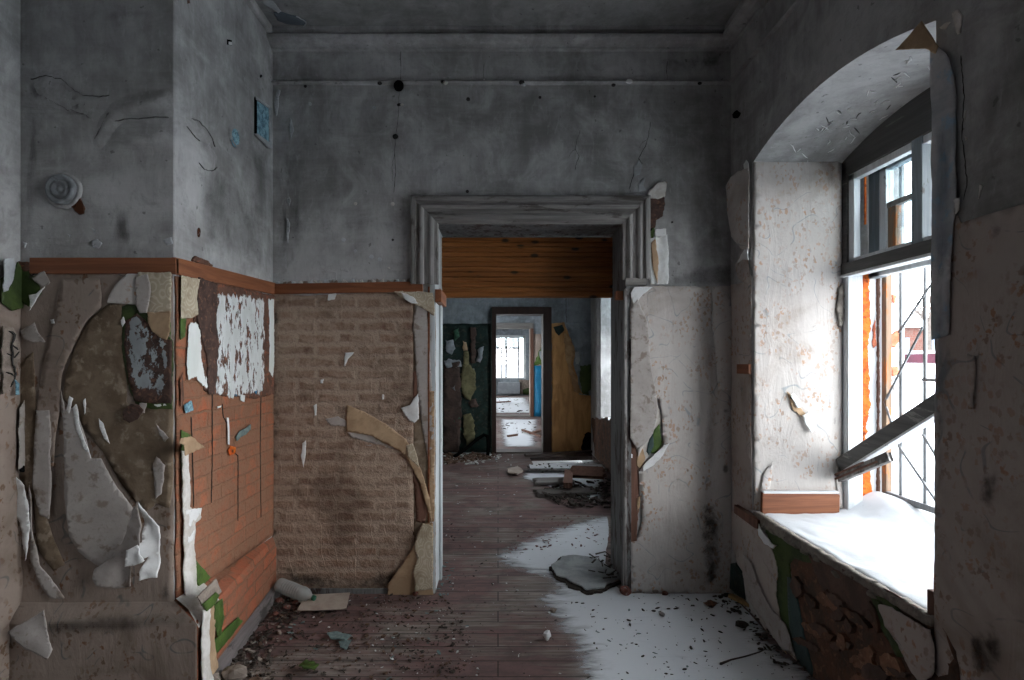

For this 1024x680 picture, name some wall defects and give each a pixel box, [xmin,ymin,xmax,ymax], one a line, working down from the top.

flaking render [646,181,673,285]
peeling [0,258,47,680]
flaking render [121,254,414,600]
peeling [765,530,813,676]
peeling [871,596,903,657]